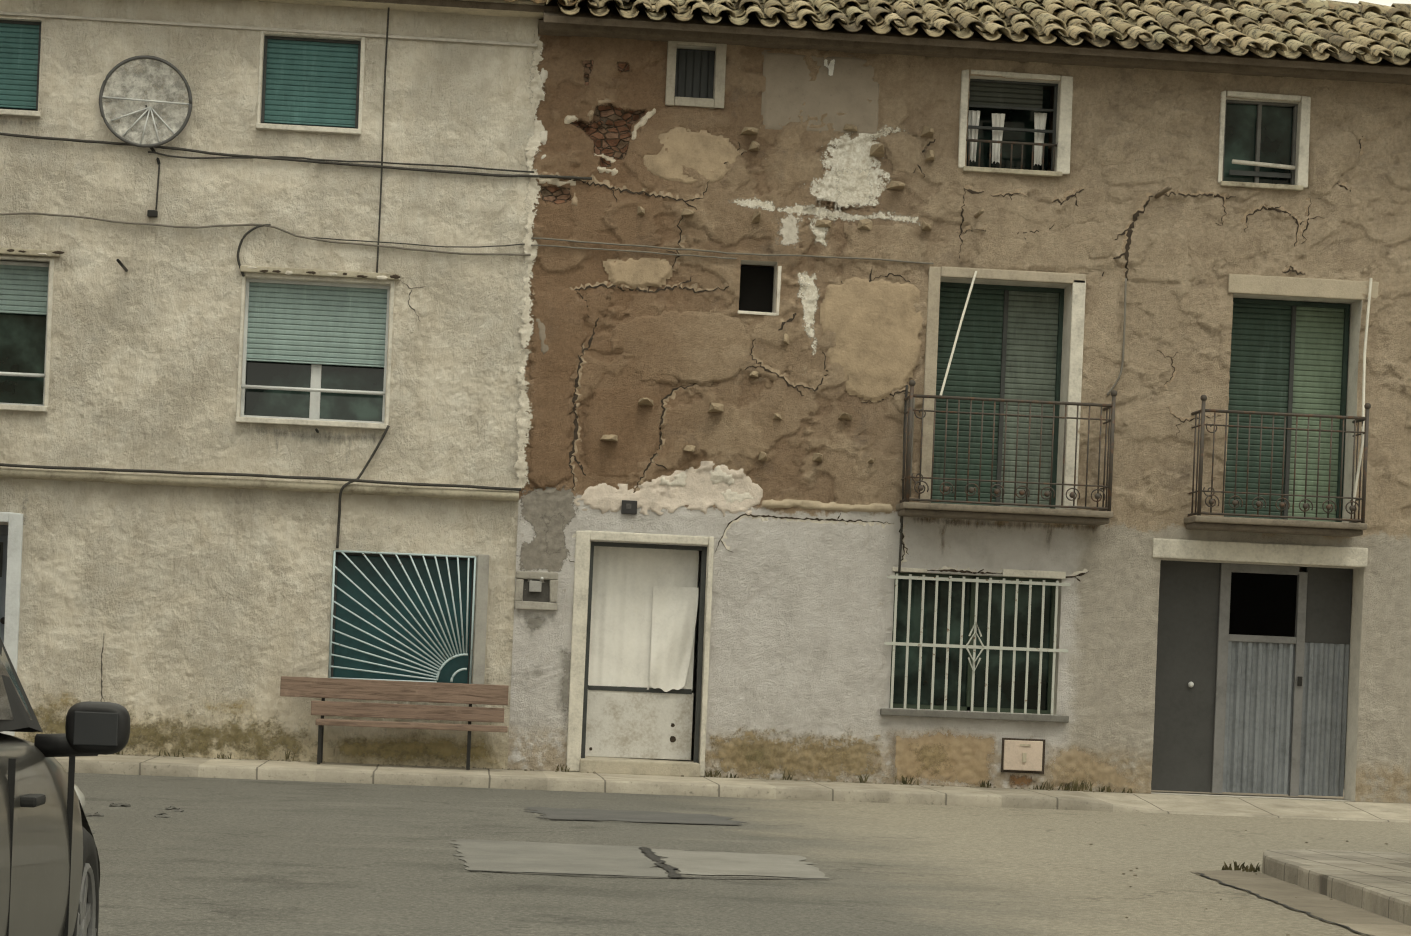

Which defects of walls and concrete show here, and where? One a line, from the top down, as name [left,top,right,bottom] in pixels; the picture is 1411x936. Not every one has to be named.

spalling [564,60,656,176]
crack [913,138,936,178]
peeling [514,30,578,492]
crack [841,266,911,283]
crack [957,185,1084,258]
crack [1102,136,1366,282]
crack [540,142,747,493]
crack [745,313,828,396]
crack [861,388,910,403]
crack [1157,349,1221,435]
peeling [574,461,893,517]